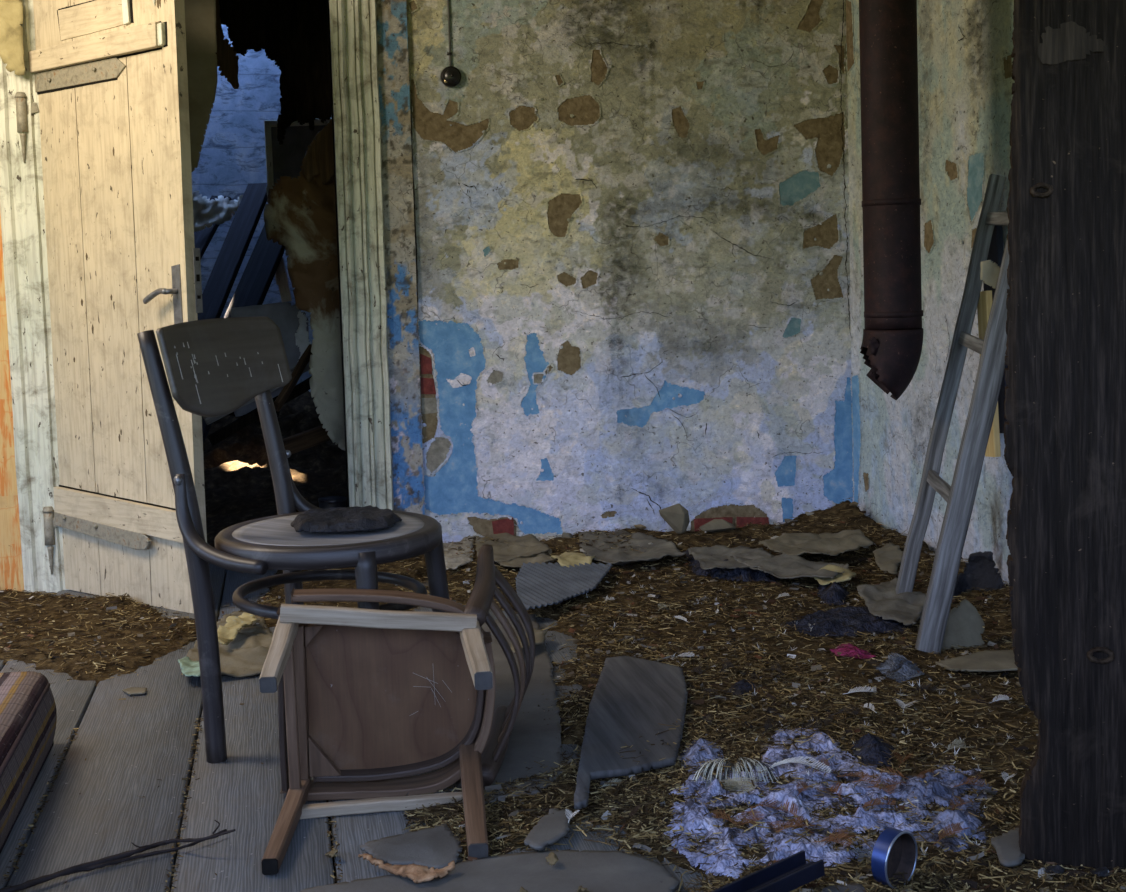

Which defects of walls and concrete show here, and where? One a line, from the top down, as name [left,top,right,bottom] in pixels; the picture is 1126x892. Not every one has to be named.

flaking render [409,71,490,154]
flaking render [507,98,542,132]
flaking render [554,48,611,128]
flaking render [670,105,693,139]
flaking render [753,0,855,207]
flaking render [482,242,520,272]
flaking render [546,191,591,239]
flaking render [801,212,845,301]
peeling [418,319,564,537]
peeling [517,332,583,420]
peeling [615,376,707,429]
peeling [811,372,875,505]